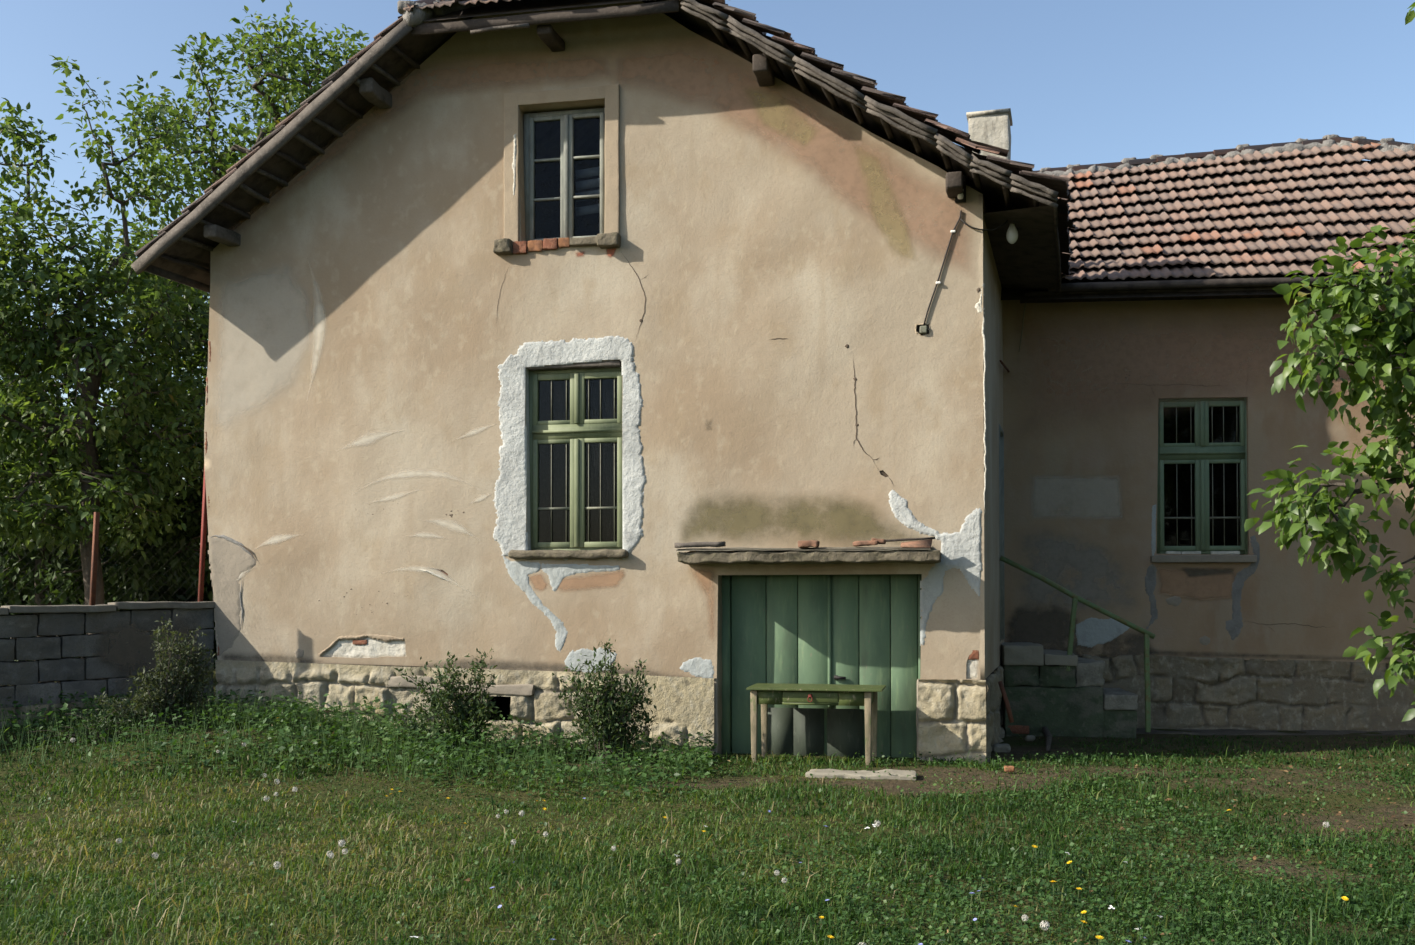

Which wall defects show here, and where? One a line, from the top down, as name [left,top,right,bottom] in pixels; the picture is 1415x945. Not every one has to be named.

crack [627,260,646,338]
crack [845,344,894,486]
spalling [294,634,407,658]